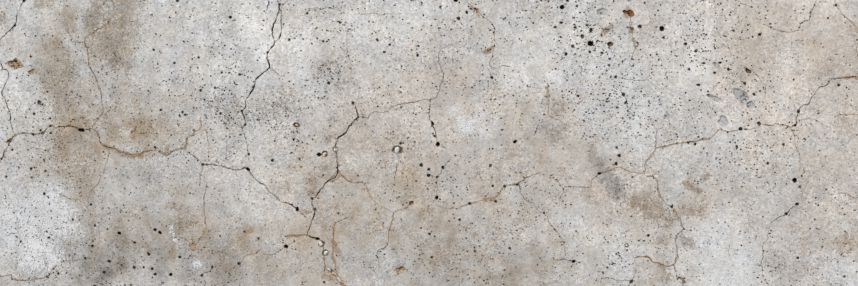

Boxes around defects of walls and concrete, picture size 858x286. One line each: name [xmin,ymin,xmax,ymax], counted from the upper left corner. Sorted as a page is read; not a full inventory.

crack [0,0,577,286]
crack [556,1,858,286]